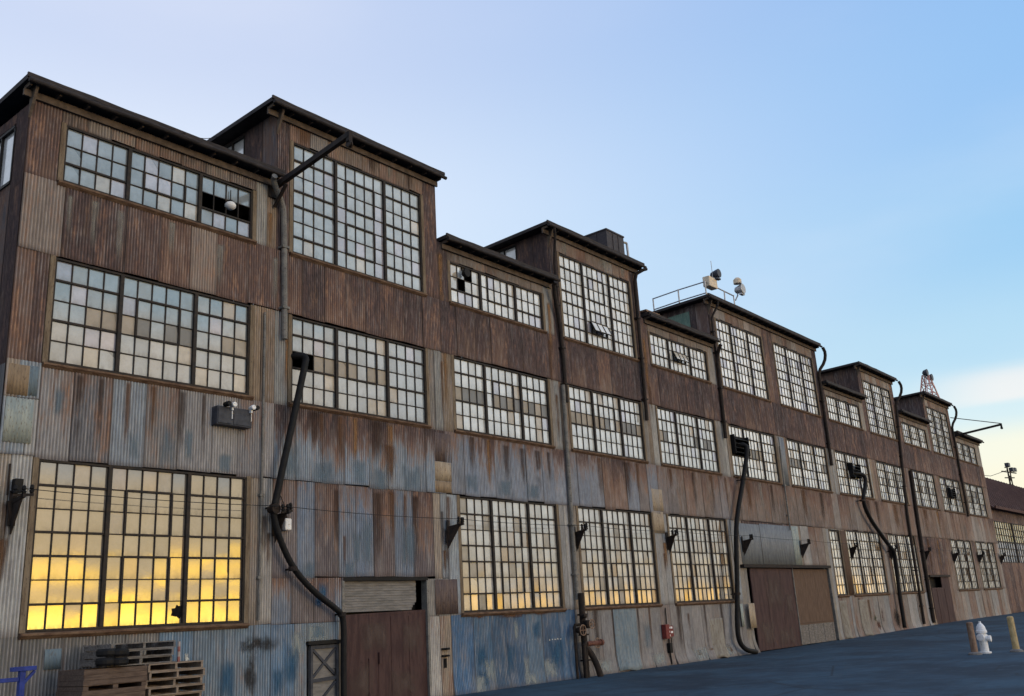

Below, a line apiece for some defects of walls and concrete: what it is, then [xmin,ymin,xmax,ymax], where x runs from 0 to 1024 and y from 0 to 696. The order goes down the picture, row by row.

rust [375,492,418,546]